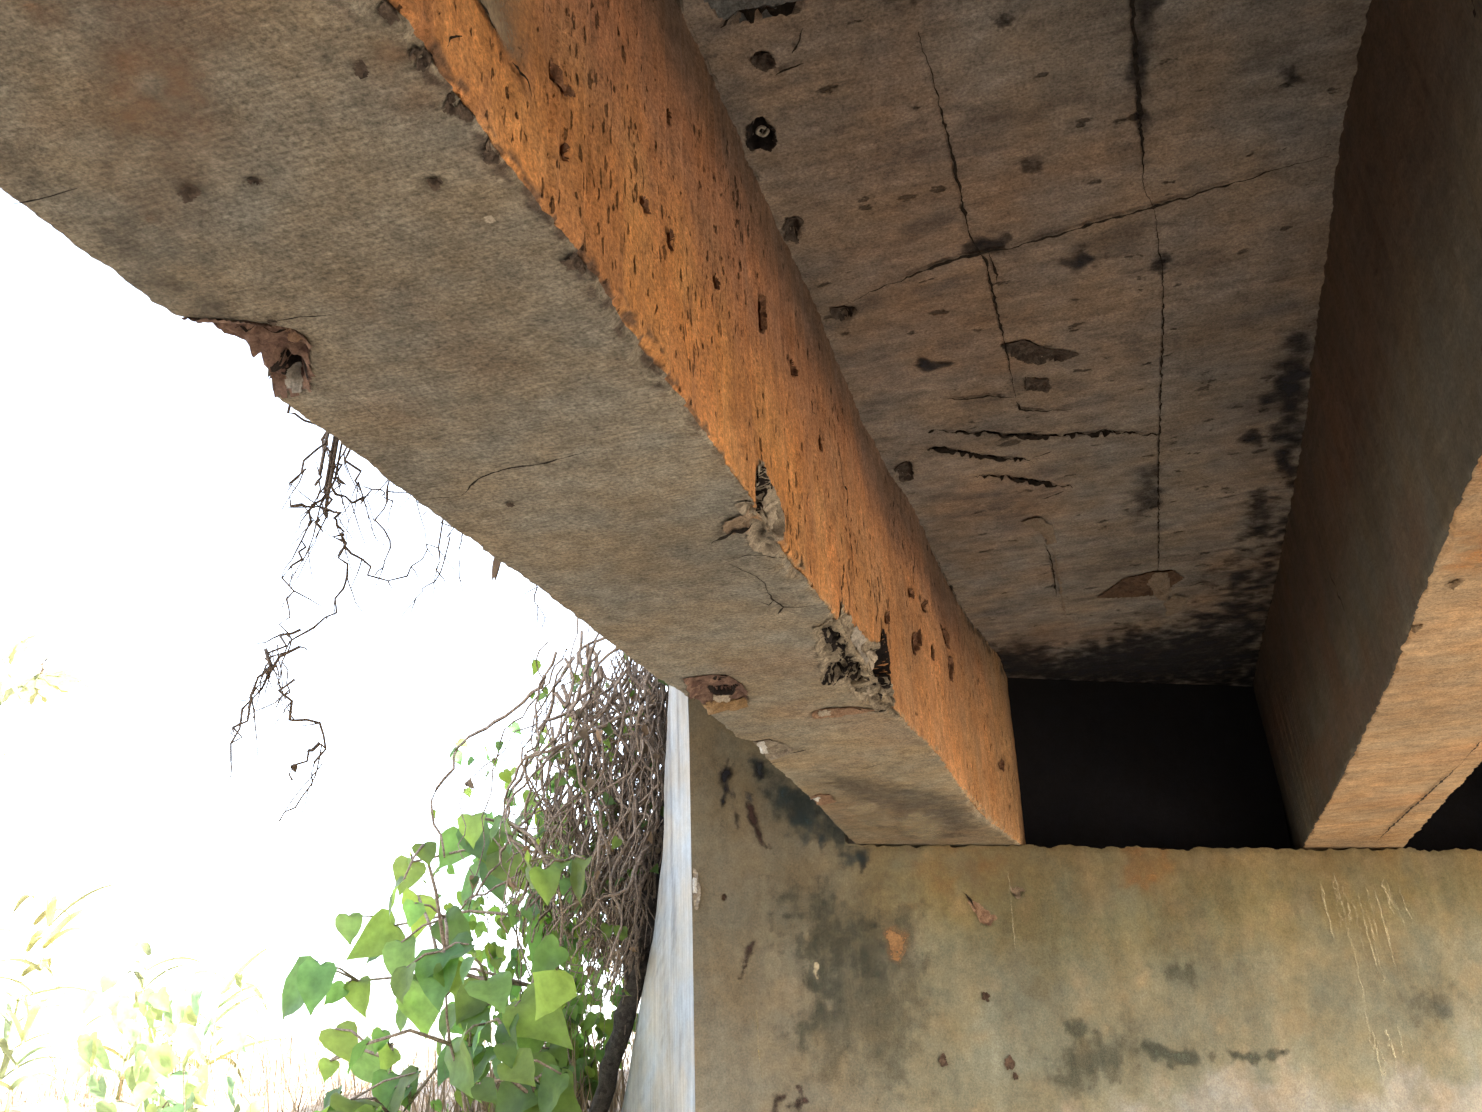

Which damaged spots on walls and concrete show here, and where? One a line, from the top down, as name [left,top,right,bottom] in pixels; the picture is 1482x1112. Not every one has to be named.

crack [846,156,1328,305]
spalling [181,317,316,399]
crack [922,395,1158,500]
spalling [711,454,785,557]
spalling [683,675,749,715]
spalling [812,569,900,719]
water stain [720,759,867,872]
crack [1378,741,1481,840]
water stain [798,894,881,1039]
water stain [788,1085,809,1109]
water stain [1066,1021,1122,1089]
water stain [1142,1041,1286,1068]